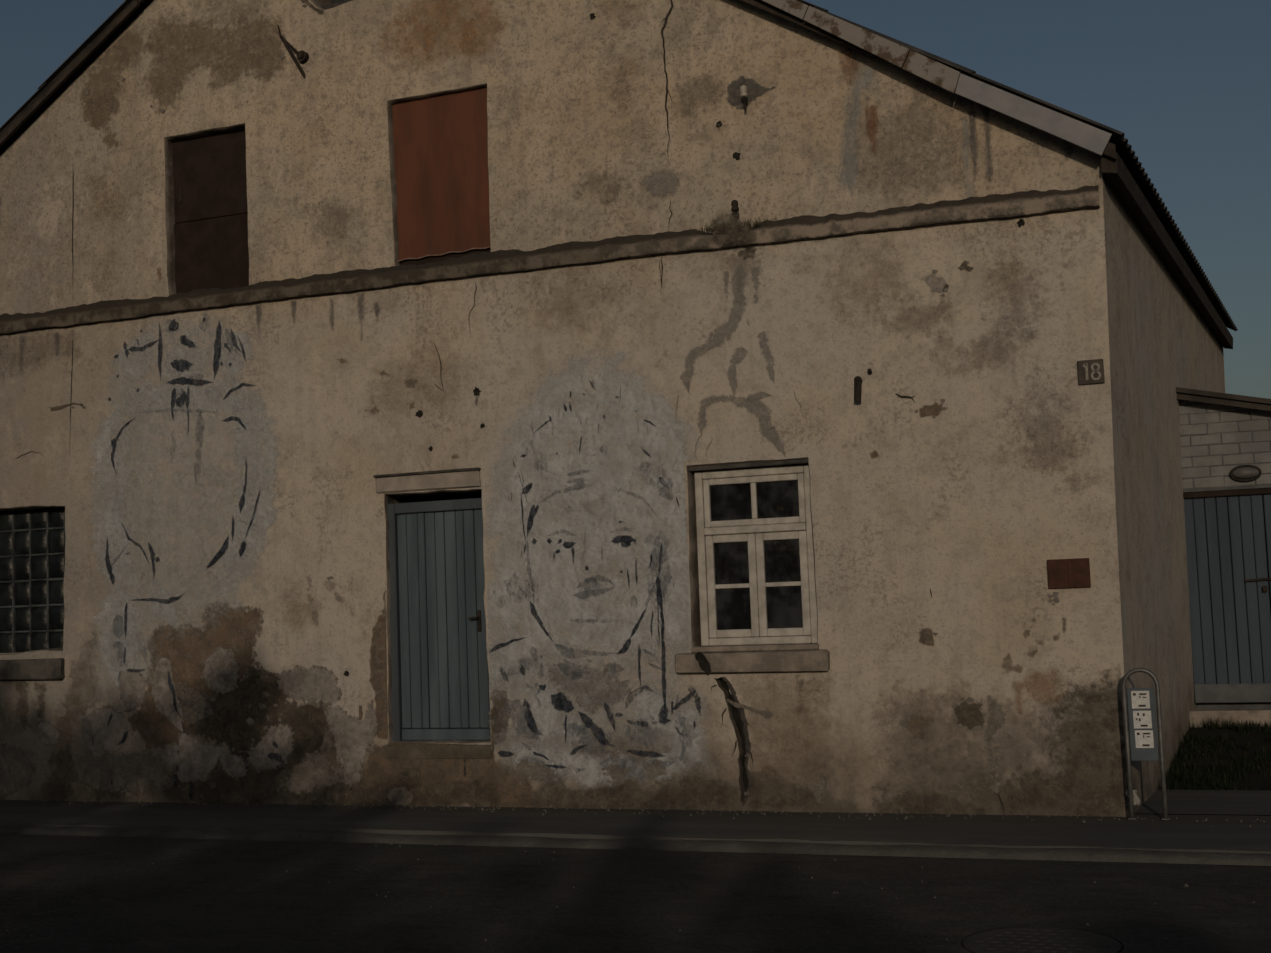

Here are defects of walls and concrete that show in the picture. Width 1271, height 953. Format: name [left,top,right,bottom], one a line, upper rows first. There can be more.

crack [661,0,674,165]
flaking render [127,583,390,794]
crack [695,652,774,806]
water stain [1000,675,1128,817]